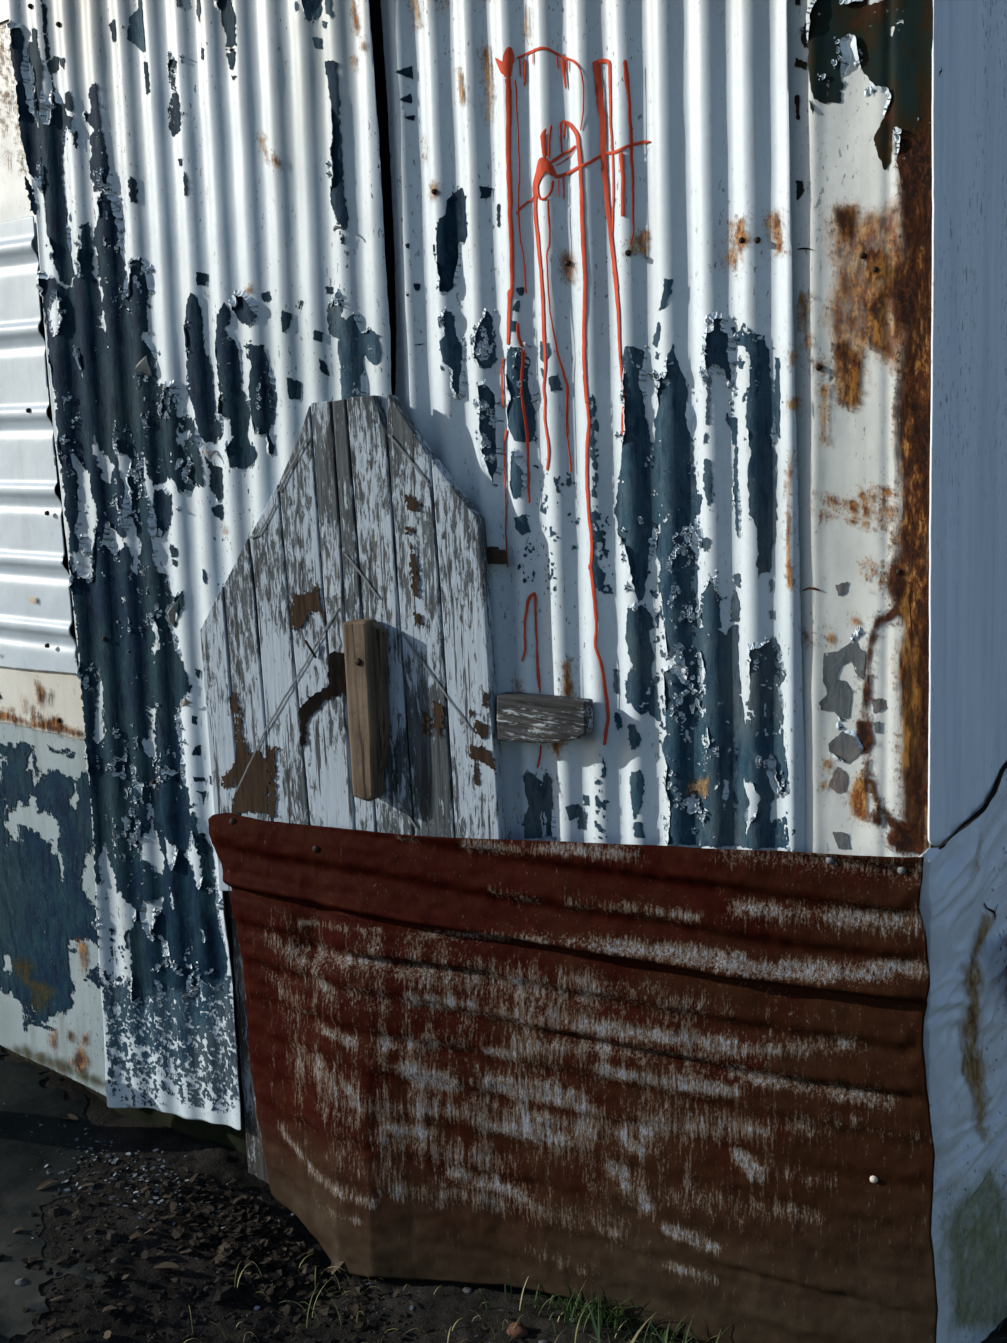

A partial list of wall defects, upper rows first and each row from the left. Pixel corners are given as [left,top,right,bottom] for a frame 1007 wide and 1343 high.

peeling [294,0,349,244]
peeling [796,180,804,201]
peeling [794,0,942,189]
peeling [313,286,381,400]
peeling [0,0,302,1113]
peeling [404,186,796,852]
corrosion [0,680,83,739]
corrosion [208,132,938,1343]
crack [939,761,1007,849]
corrosion [961,914,993,1140]